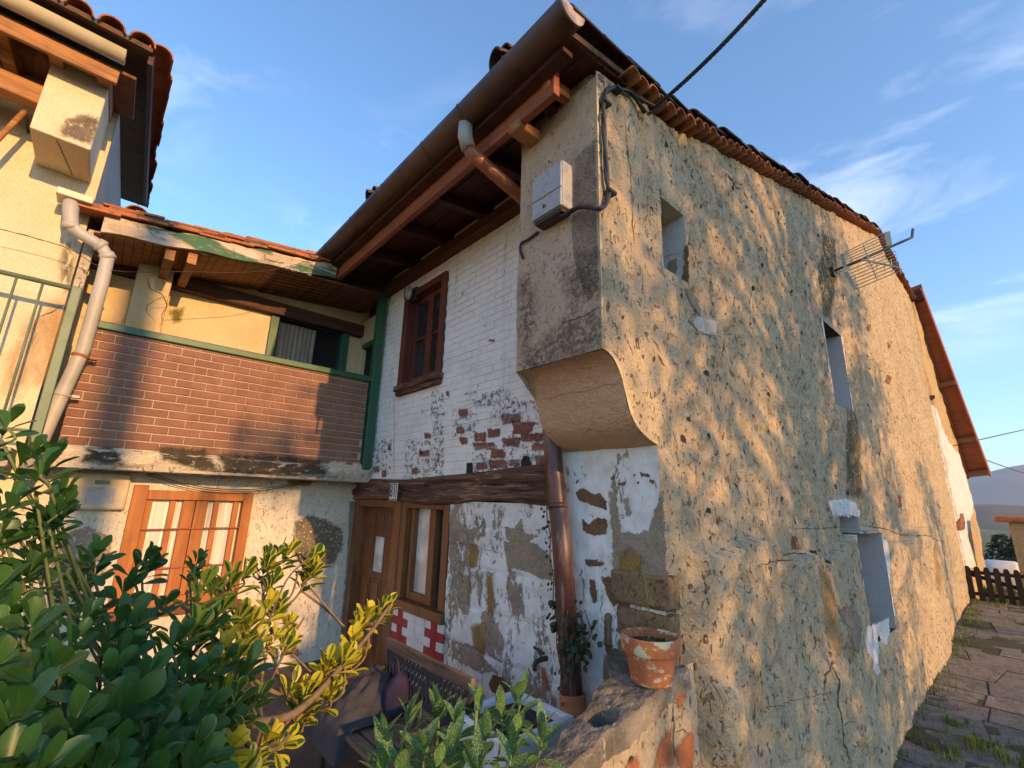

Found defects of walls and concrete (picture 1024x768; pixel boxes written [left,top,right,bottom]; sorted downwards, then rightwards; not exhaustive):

damp [62,115,98,142]
damp [82,447,122,465]
damp [159,447,326,475]
peeling [404,384,545,479]
damp [294,515,343,564]
peeling [466,519,486,540]
flaking render [503,519,553,619]
flaking render [576,472,670,653]
crack [758,524,946,567]
peeling [451,573,509,693]